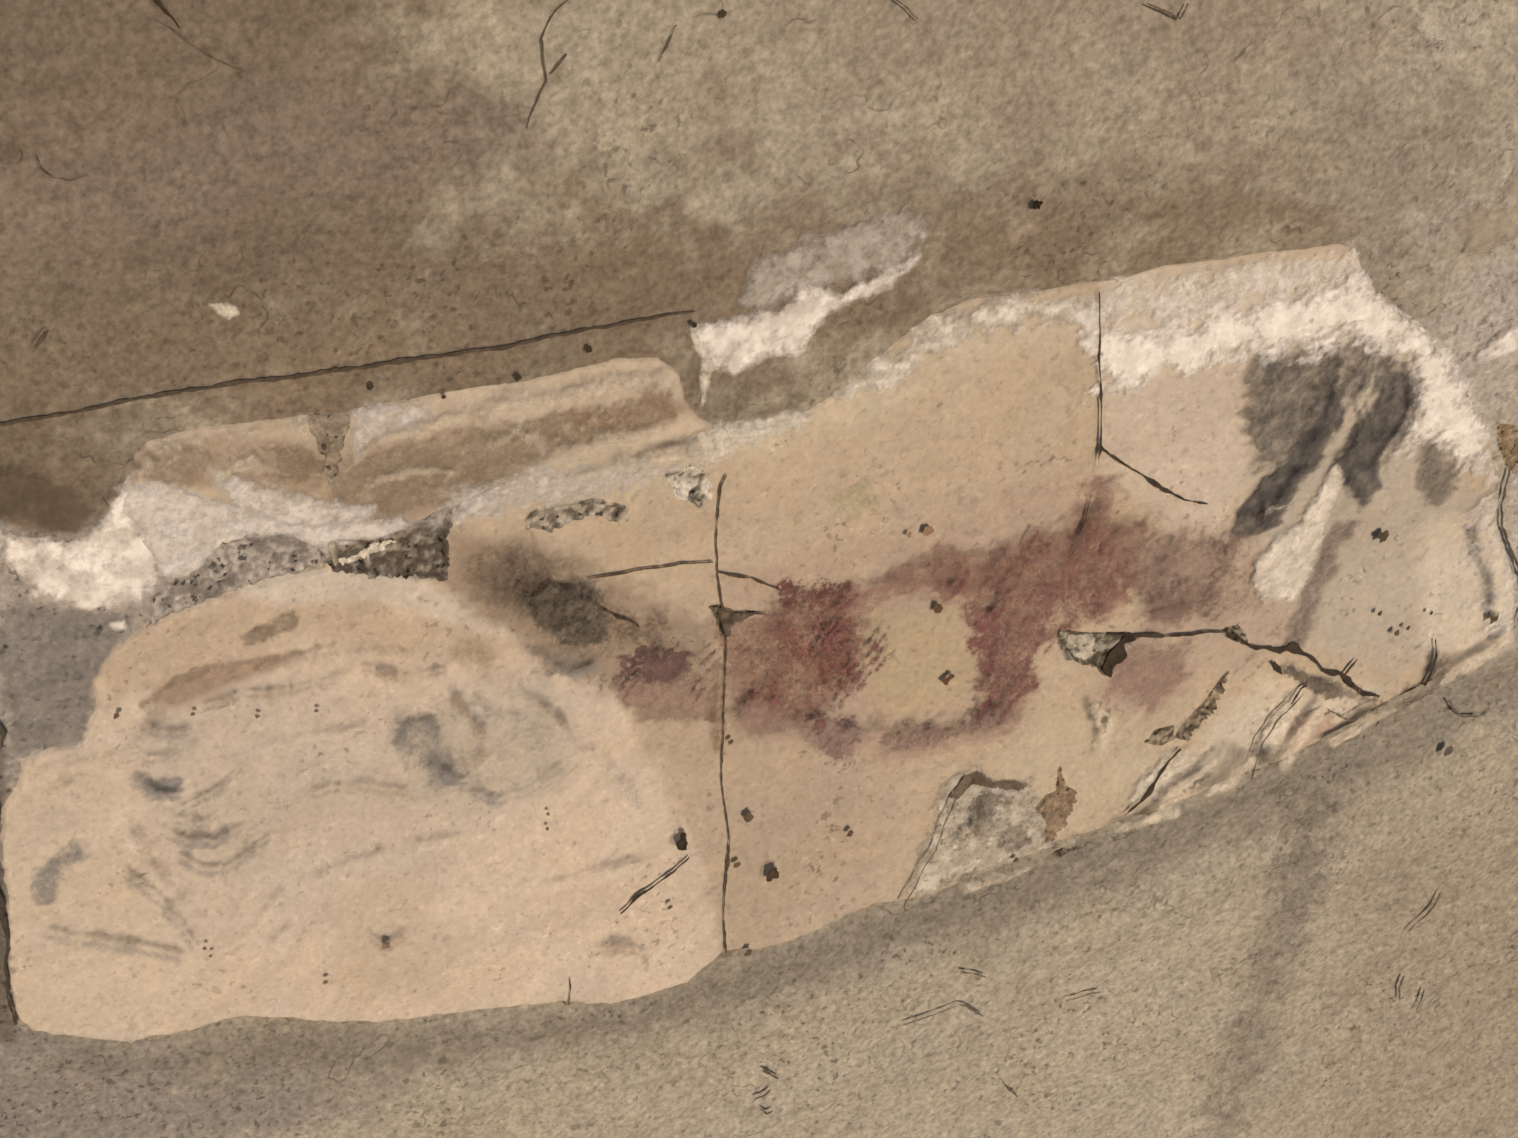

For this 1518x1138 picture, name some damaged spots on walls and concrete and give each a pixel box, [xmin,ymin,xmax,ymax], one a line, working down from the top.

water stain [691,204,926,405]
water stain [1459,185,1518,253]
flaking render [149,486,493,625]
water stain [0,403,812,630]
crack [1072,292,1208,554]
water stain [834,249,1518,637]
crack [0,725,8,750]
crack [588,475,781,953]
crack [1103,629,1437,816]
crack [903,783,969,907]
flaking render [908,766,1078,898]
crack [0,894,18,1025]